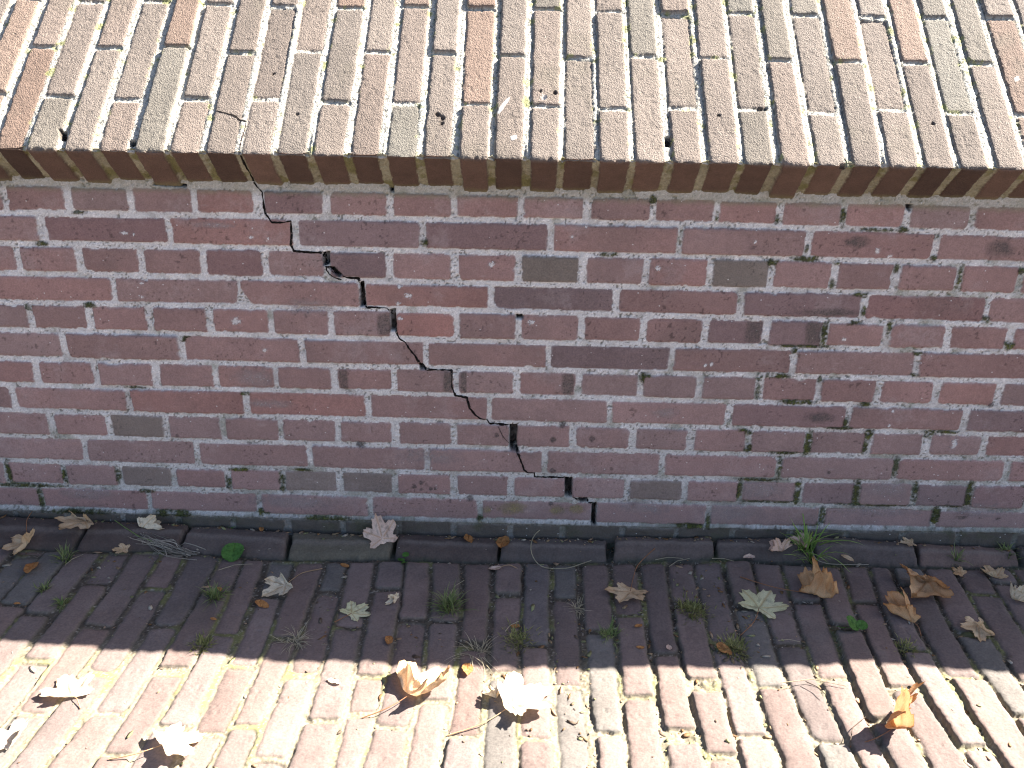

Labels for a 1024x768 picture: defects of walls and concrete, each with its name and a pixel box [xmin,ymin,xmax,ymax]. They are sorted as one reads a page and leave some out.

crack [215,110,596,523]